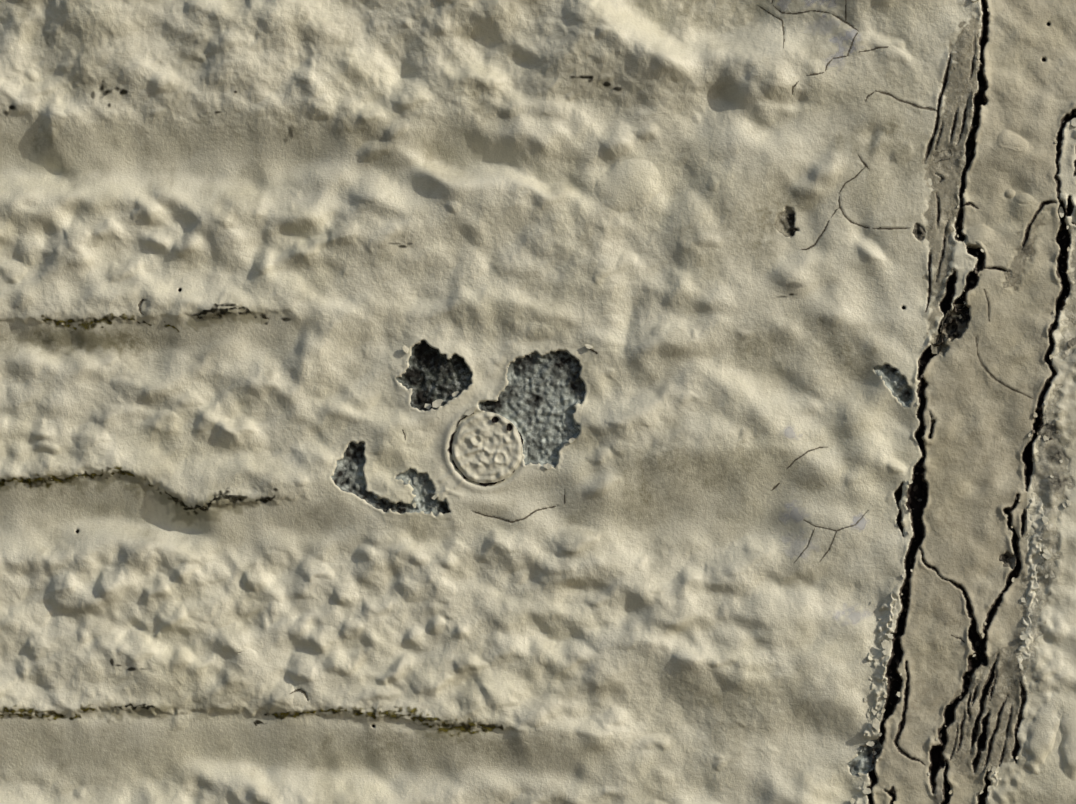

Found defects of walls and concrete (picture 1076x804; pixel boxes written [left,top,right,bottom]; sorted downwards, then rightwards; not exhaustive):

crack [757,0,889,95]
spalling [775,207,799,238]
crack [802,155,907,250]
spalling [396,341,472,411]
spalling [464,351,585,469]
spalling [874,364,913,407]
crack [865,0,1076,804]
spalling [331,442,450,516]
crack [771,447,823,491]
crack [794,510,869,563]